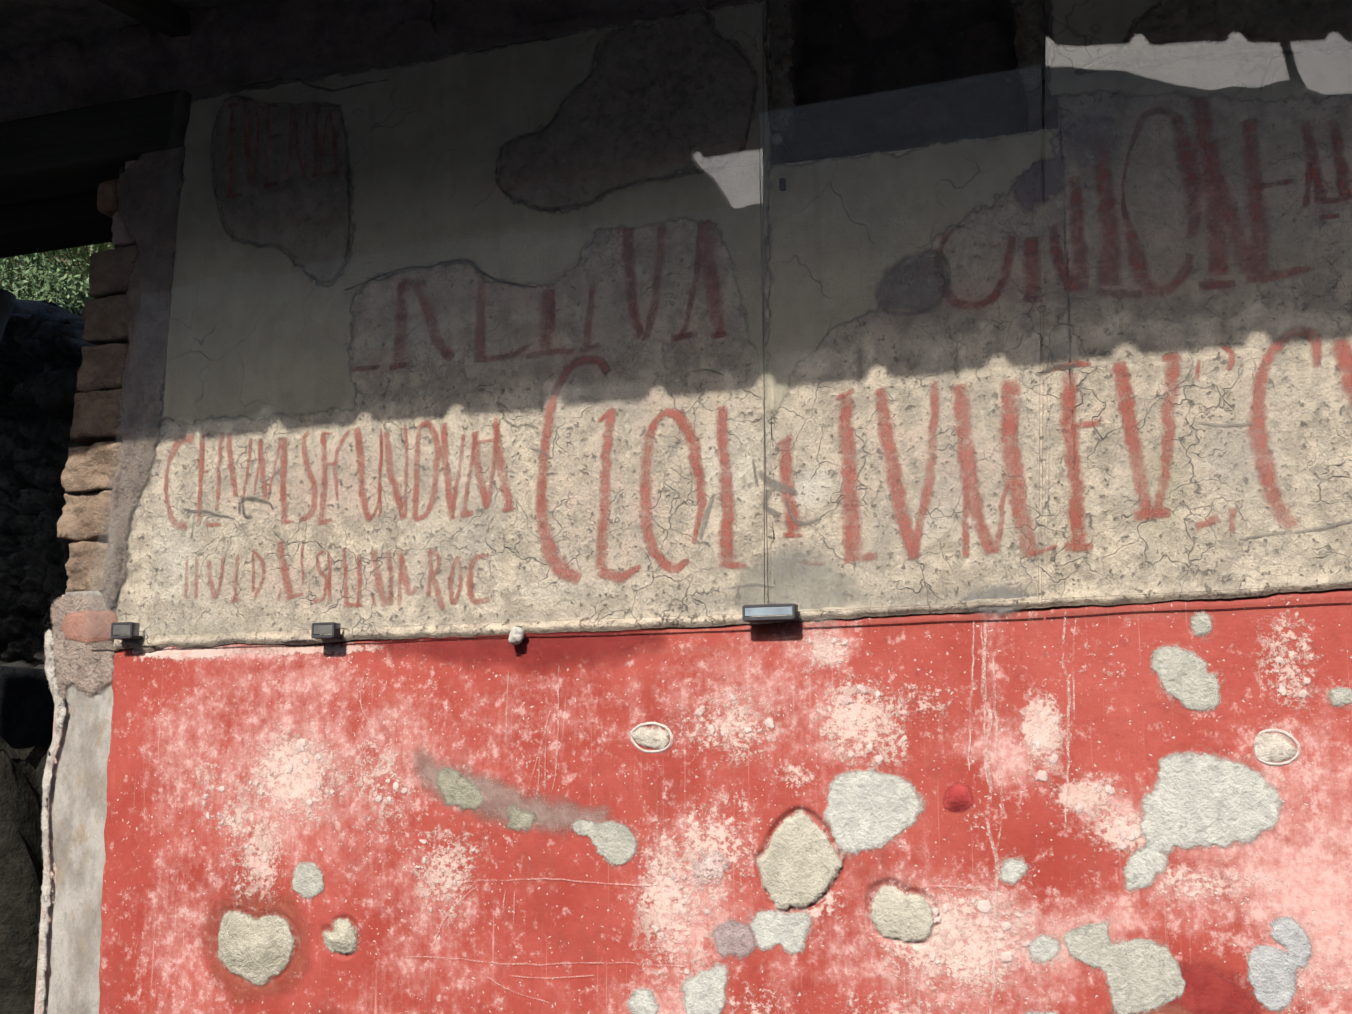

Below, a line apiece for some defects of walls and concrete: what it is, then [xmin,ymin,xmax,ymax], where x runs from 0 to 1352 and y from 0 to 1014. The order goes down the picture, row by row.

spalling [1076,0,1352,75]
spalling [496,6,758,213]
damp [712,919,755,959]